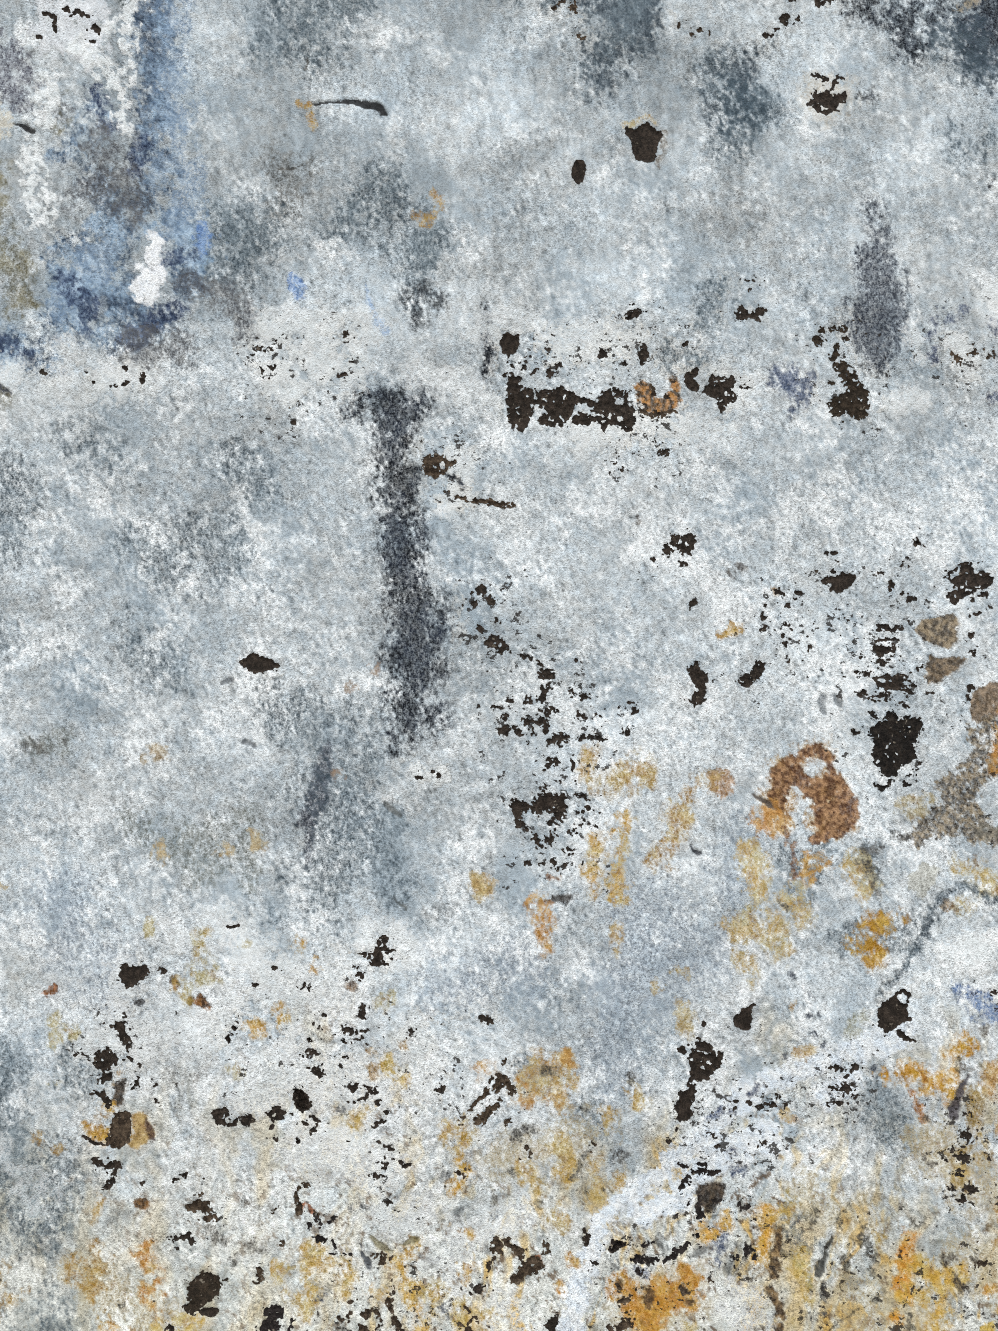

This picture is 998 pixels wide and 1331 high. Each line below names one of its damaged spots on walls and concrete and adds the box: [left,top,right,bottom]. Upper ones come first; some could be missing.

peeling [497,301,678,457]
peeling [812,319,870,423]
damp [835,188,984,421]
damp [0,144,838,1331]
peeling [457,584,613,877]
rust [570,739,738,960]
rust [715,732,912,993]
peeling [680,537,998,854]
damp [903,922,998,999]
rust [50,1190,216,1331]
damp [481,1016,926,1331]
rust [597,1026,998,1331]